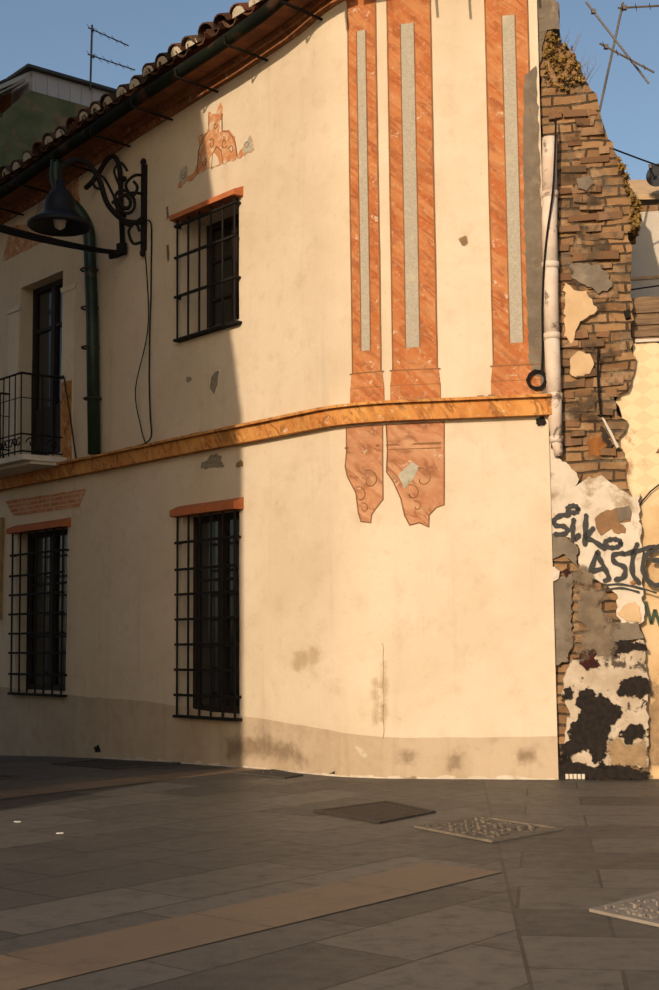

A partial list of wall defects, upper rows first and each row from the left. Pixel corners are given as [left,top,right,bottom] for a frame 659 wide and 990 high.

flaking render [576,176,595,191]
flaking render [563,263,613,378]
spalling [209,369,220,397]
flaking render [600,417,619,449]
peeling [201,453,224,470]
flaking render [549,438,653,780]